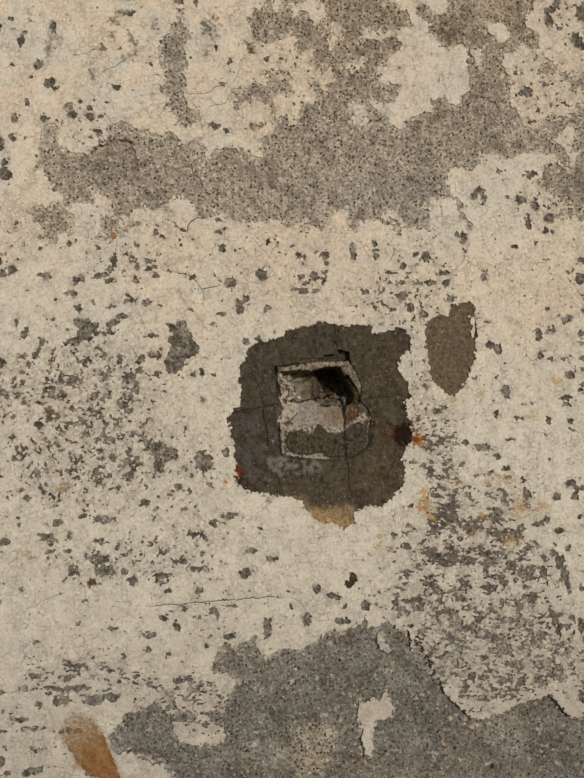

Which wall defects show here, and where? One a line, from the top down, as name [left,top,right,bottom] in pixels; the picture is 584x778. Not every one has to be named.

peeling [0,134,17,181]
peeling [27,0,584,260]
peeling [291,251,330,294]
peeling [360,251,457,334]
peeling [0,253,250,529]
spalling [252,326,395,495]
rust [387,423,426,448]
peeling [485,340,502,355]
peeling [533,325,555,341]
peeling [558,330,584,407]
rust [224,465,245,485]
rust [62,718,120,778]